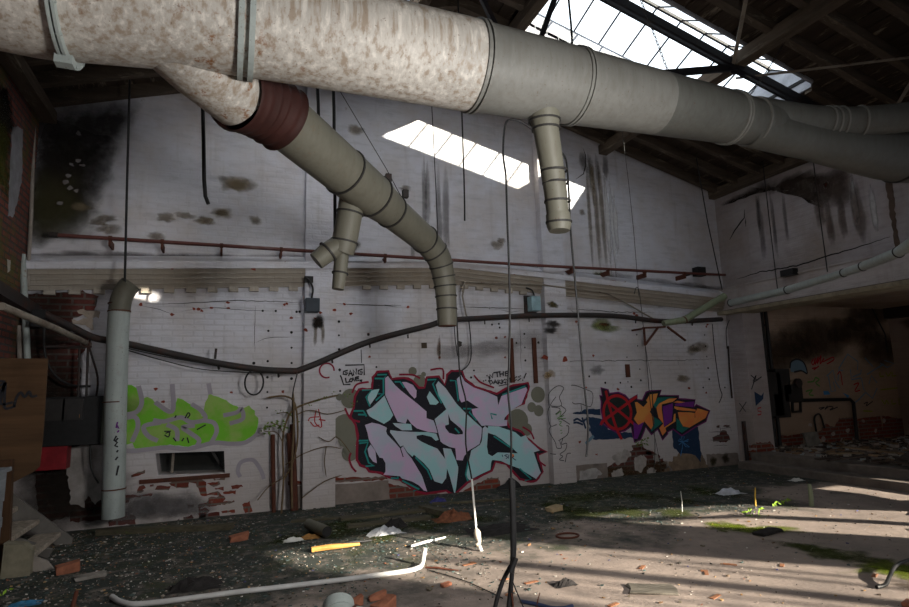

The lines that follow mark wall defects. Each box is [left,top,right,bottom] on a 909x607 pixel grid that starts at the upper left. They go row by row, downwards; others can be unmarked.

flaking render [8,126,23,218]
leakage [33,104,131,234]
leakage [160,210,228,223]
leakage [221,177,253,190]
leakage [580,157,619,264]
leakage [727,170,878,235]
flaking render [28,290,100,397]
leakage [767,308,894,368]
flaking render [62,443,252,526]
flaking render [607,444,708,474]
flaking render [818,416,905,442]